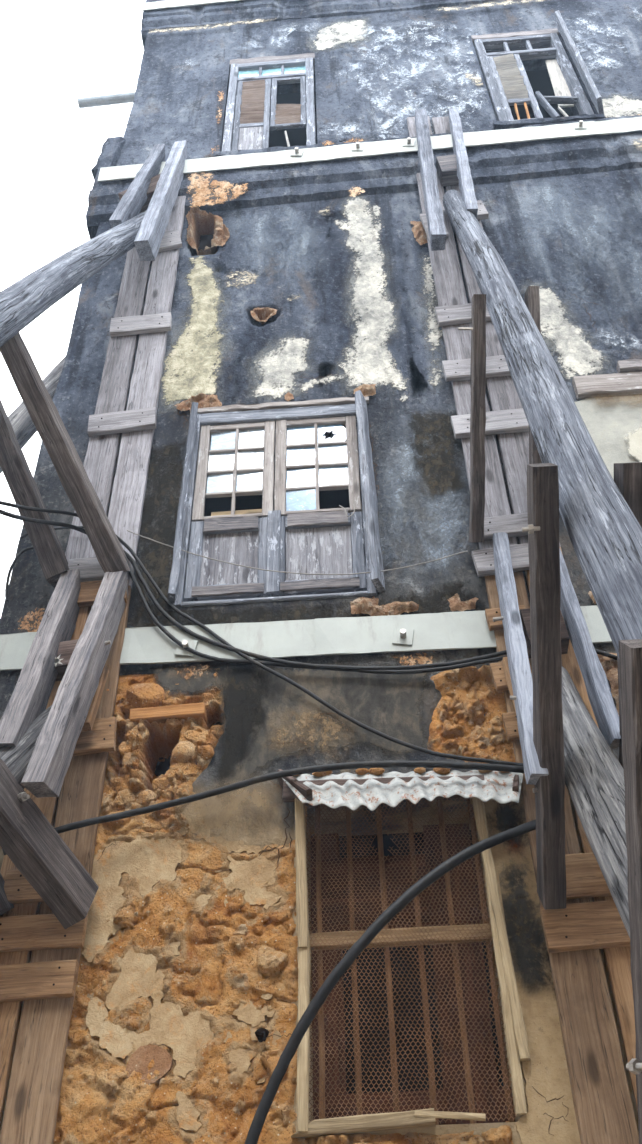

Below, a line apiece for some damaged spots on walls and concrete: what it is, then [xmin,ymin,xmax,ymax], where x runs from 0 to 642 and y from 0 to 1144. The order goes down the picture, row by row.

peeling [161,173,259,411]
peeling [250,186,408,402]
peeling [625,427,642,462]
damp [495,802,526,846]
flaking render [53,651,581,1144]
damp [500,864,555,991]
crack [532,1086,569,1136]